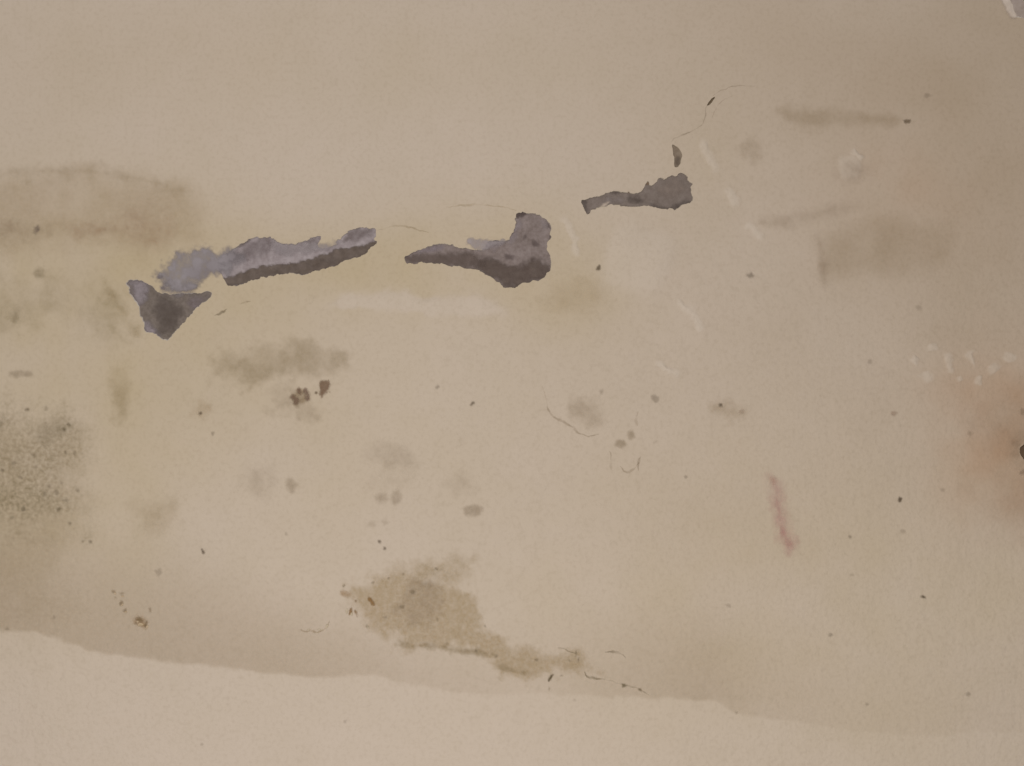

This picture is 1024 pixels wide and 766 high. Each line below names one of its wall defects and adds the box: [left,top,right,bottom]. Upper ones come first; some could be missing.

peeling [581,144,693,214]
peeling [126,227,377,341]
peeling [404,212,552,288]